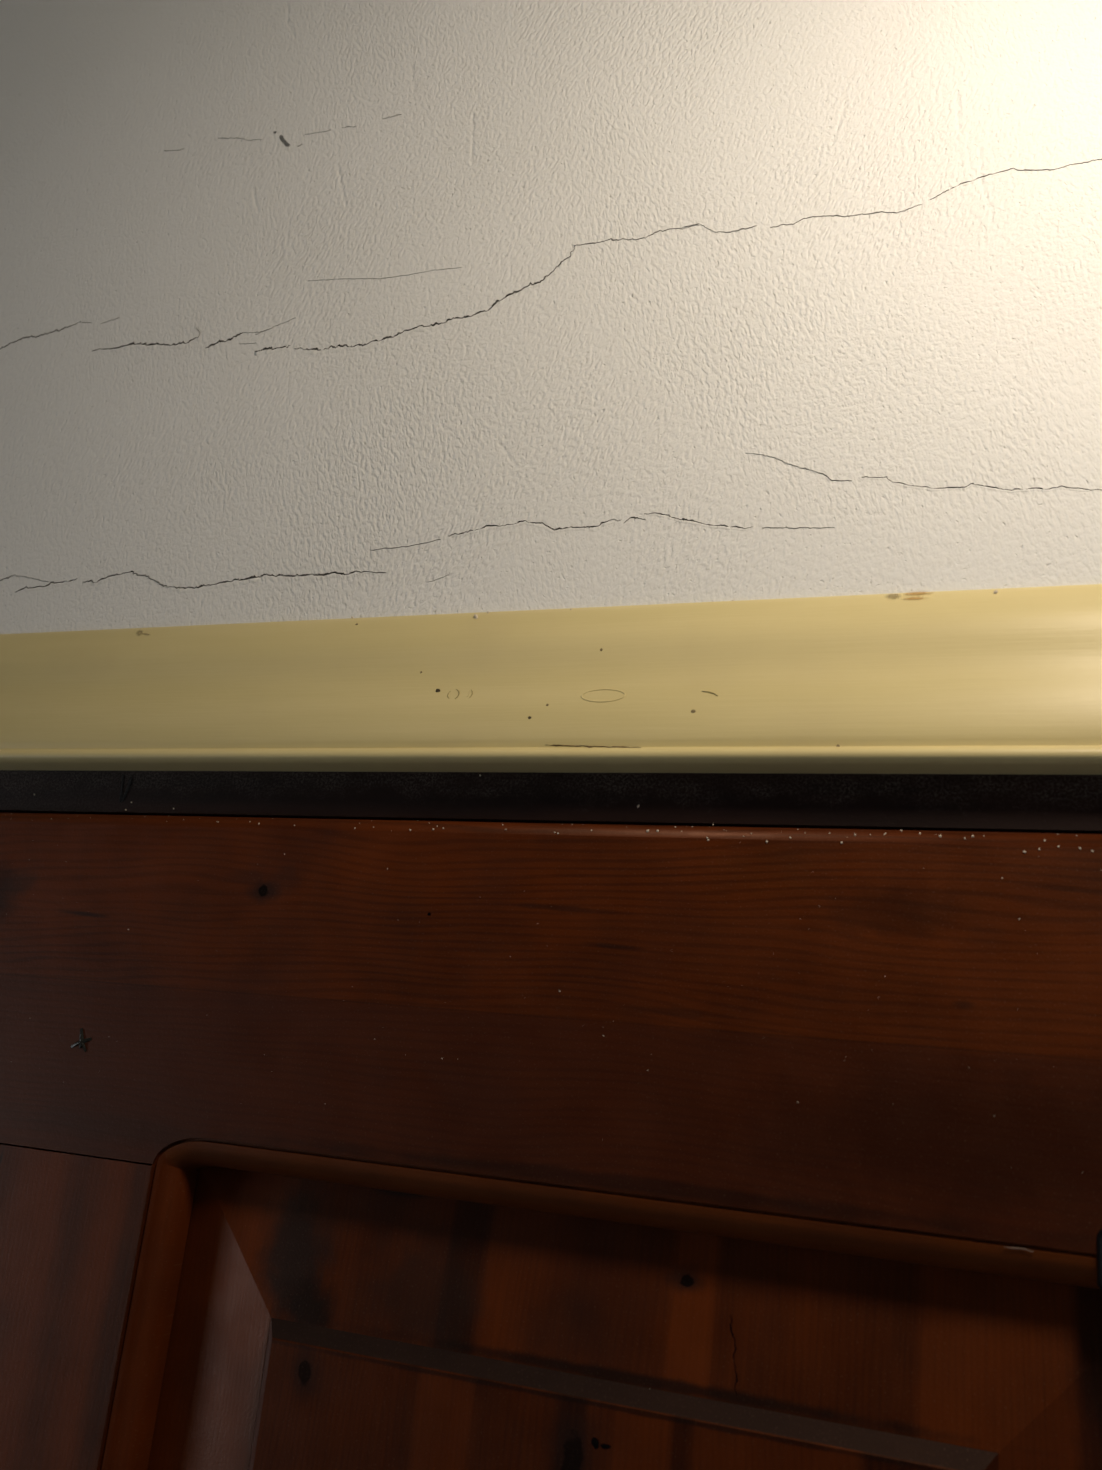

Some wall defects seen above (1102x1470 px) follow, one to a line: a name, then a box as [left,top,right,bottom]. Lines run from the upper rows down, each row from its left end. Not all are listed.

crack [0,159,1102,356]
crack [749,453,1102,493]
crack [0,512,835,594]